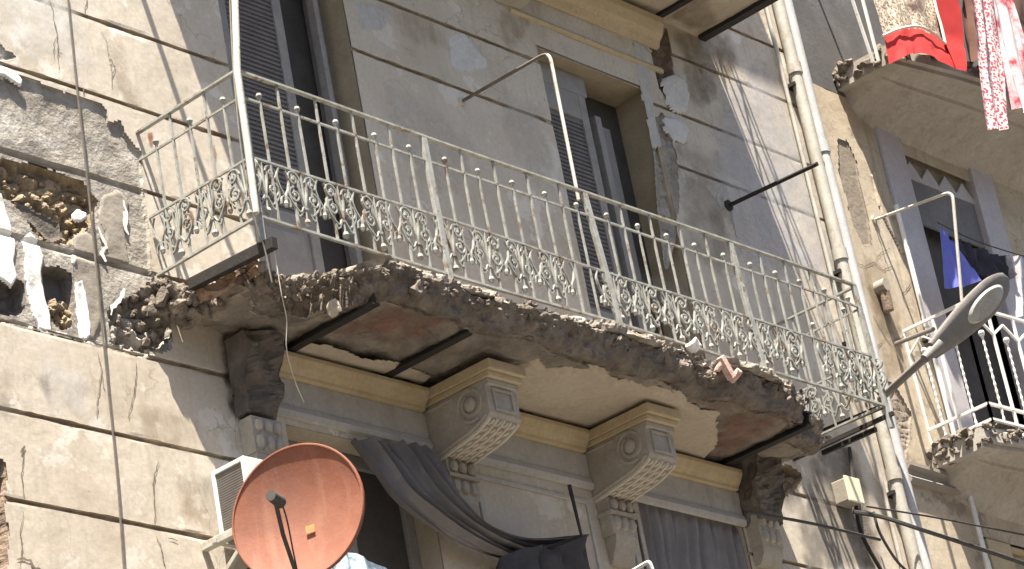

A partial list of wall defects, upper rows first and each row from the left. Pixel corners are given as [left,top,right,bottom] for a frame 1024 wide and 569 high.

crack [50,2,62,70]
crack [103,34,115,88]
flaking render [649,28,674,96]
flaking render [0,44,173,359]
flaking render [837,138,906,255]
crack [96,354,105,416]
spalling [212,260,825,497]
crack [17,446,40,569]
crack [152,462,178,569]